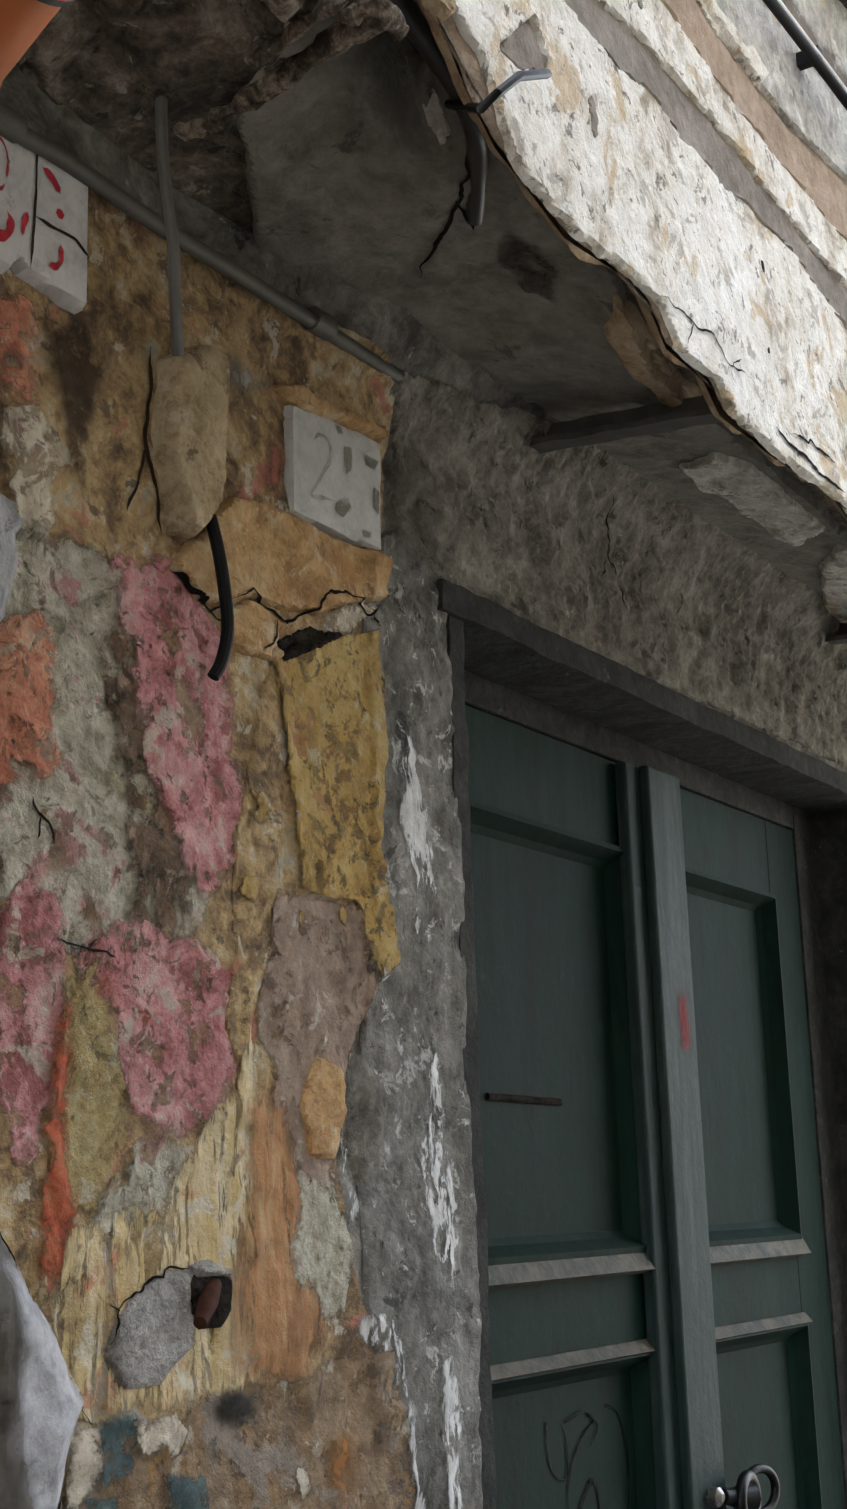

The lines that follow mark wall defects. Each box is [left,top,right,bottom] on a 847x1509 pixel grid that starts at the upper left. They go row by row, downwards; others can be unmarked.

crack [419,152,475,278]
crack [127,348,390,650]
peeling [0,293,417,1509]
leakage [420,1053,459,1283]
crack [0,1233,35,1302]
leakage [357,1313,426,1509]
leakage [442,1356,463,1509]